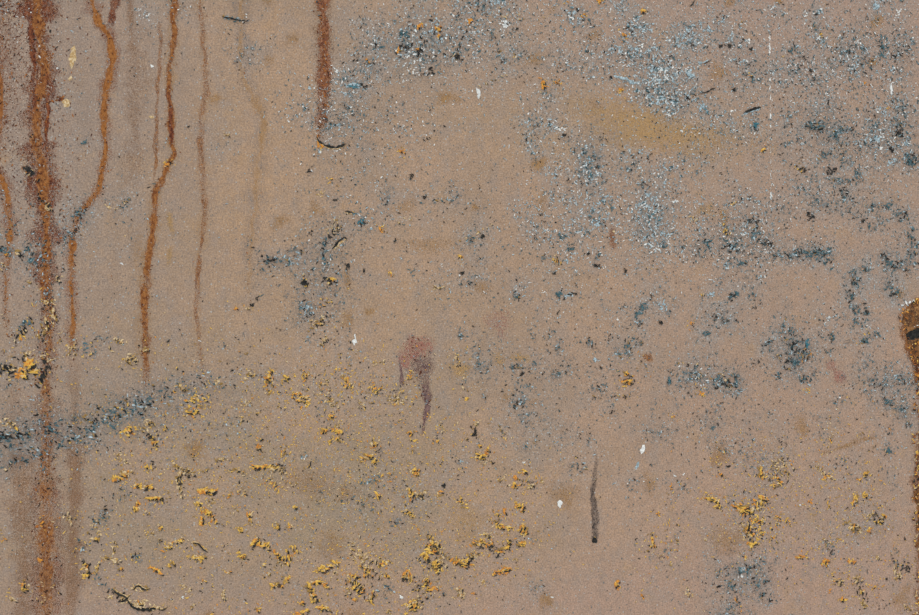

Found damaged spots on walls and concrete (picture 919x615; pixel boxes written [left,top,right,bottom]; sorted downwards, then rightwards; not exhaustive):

rust [0,0,580,615]
rust [893,290,919,417]
damp [589,452,600,543]
rust [629,408,919,615]